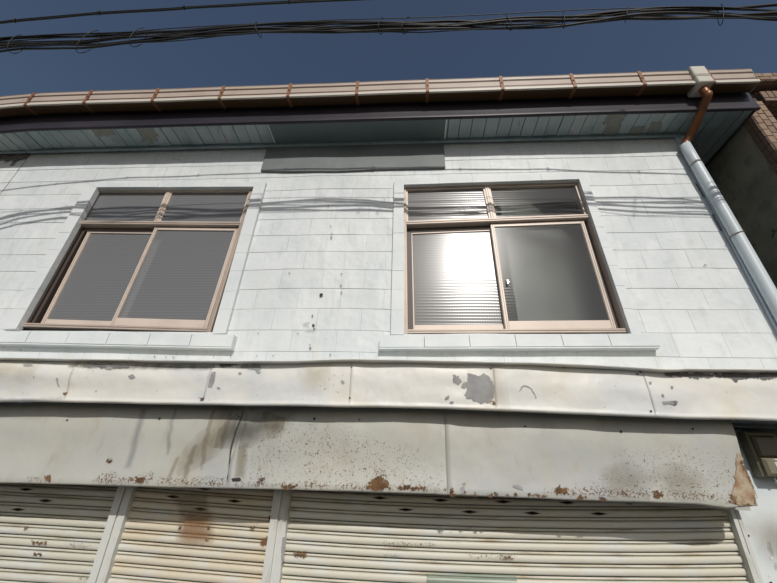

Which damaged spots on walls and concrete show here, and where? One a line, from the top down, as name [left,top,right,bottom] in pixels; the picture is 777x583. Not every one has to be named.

peeling [0,153,31,165]
peeling [453,373,495,404]
peeling [662,372,777,397]
corrosion [97,427,477,497]
corrosion [528,484,718,501]